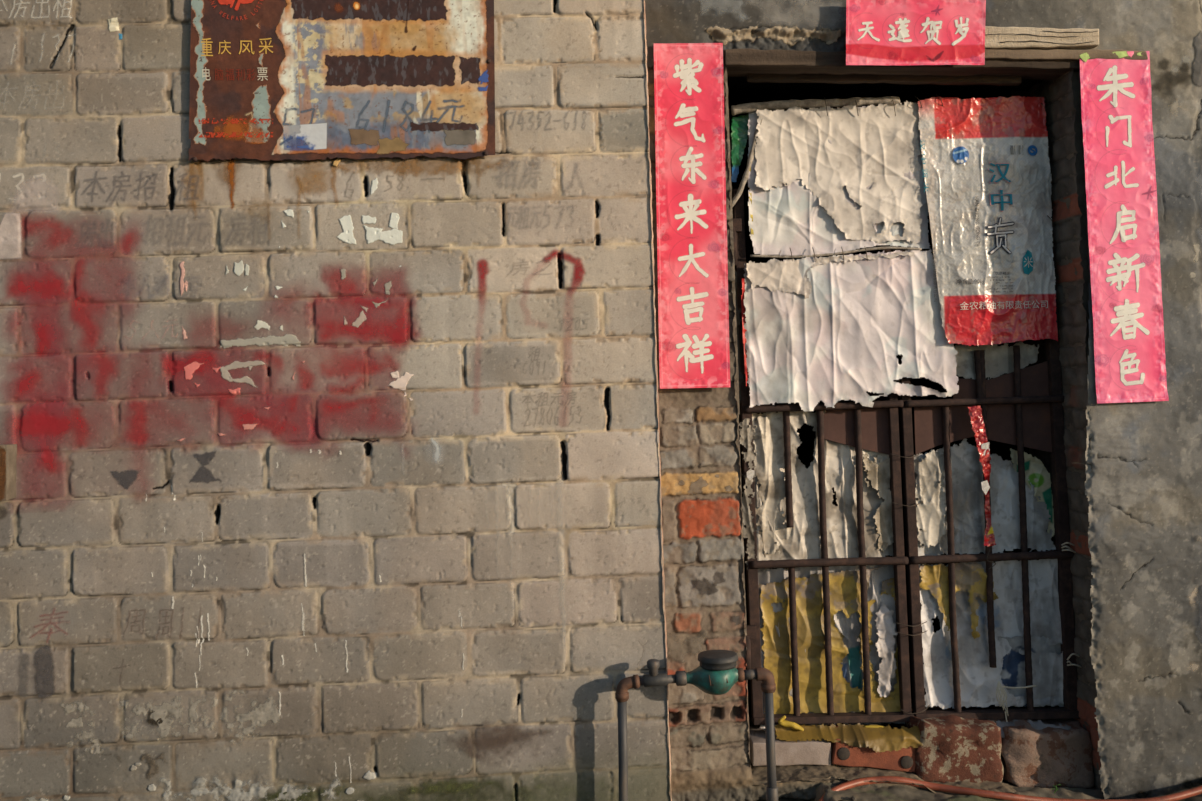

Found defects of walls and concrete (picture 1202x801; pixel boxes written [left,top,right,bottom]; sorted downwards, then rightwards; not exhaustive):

crack [50,24,74,69]
spalling [707,26,841,46]
damp [1190,234,1202,278]